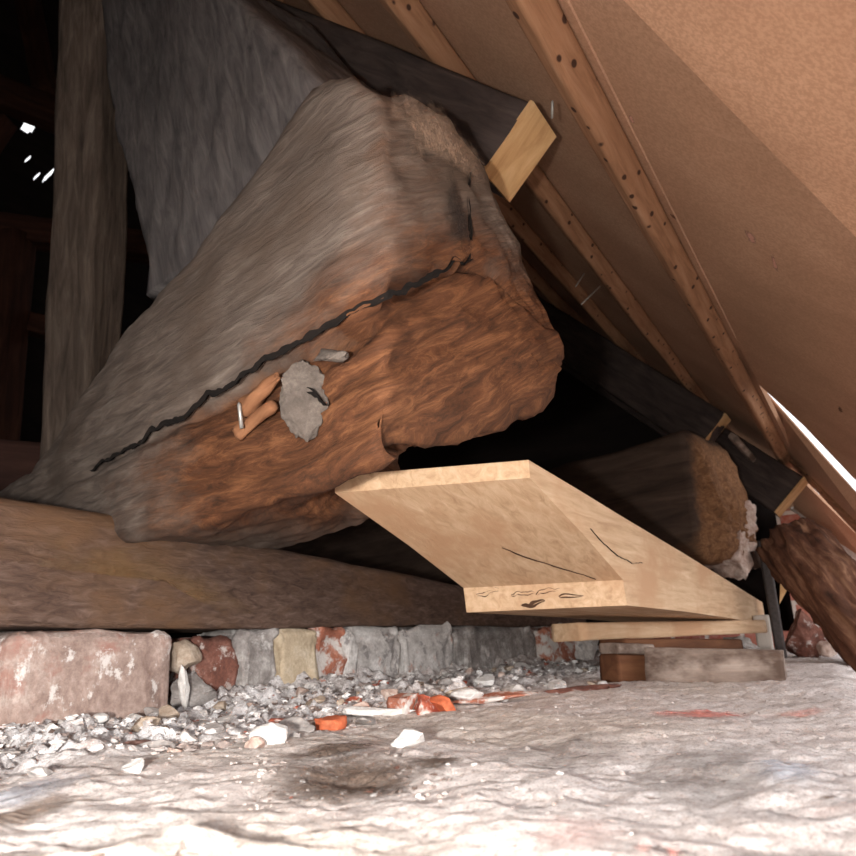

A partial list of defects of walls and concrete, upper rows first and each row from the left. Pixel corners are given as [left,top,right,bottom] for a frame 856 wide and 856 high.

leakage [275,742,458,806]
crack [175,836,199,856]